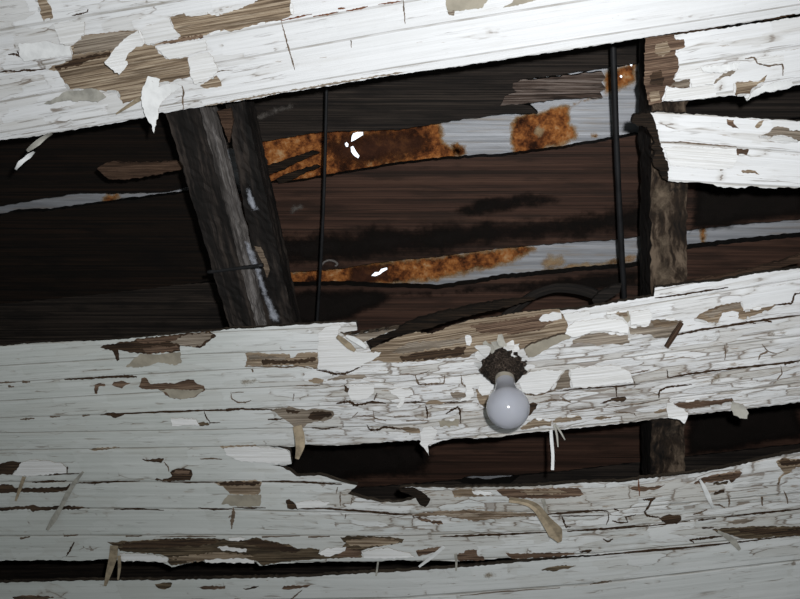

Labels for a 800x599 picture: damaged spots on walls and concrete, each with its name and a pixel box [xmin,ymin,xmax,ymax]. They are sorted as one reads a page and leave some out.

peeling [18,0,294,104]
peeling [644,34,690,105]
corrosion [262,123,465,181]
corrosion [511,106,576,152]
corrosion [291,246,534,283]
peeling [101,331,216,368]
peeling [245,352,367,392]
peeling [371,309,683,363]
crack [524,293,800,416]
peeling [108,535,440,566]
crack [440,479,800,556]
peeling [713,519,800,539]